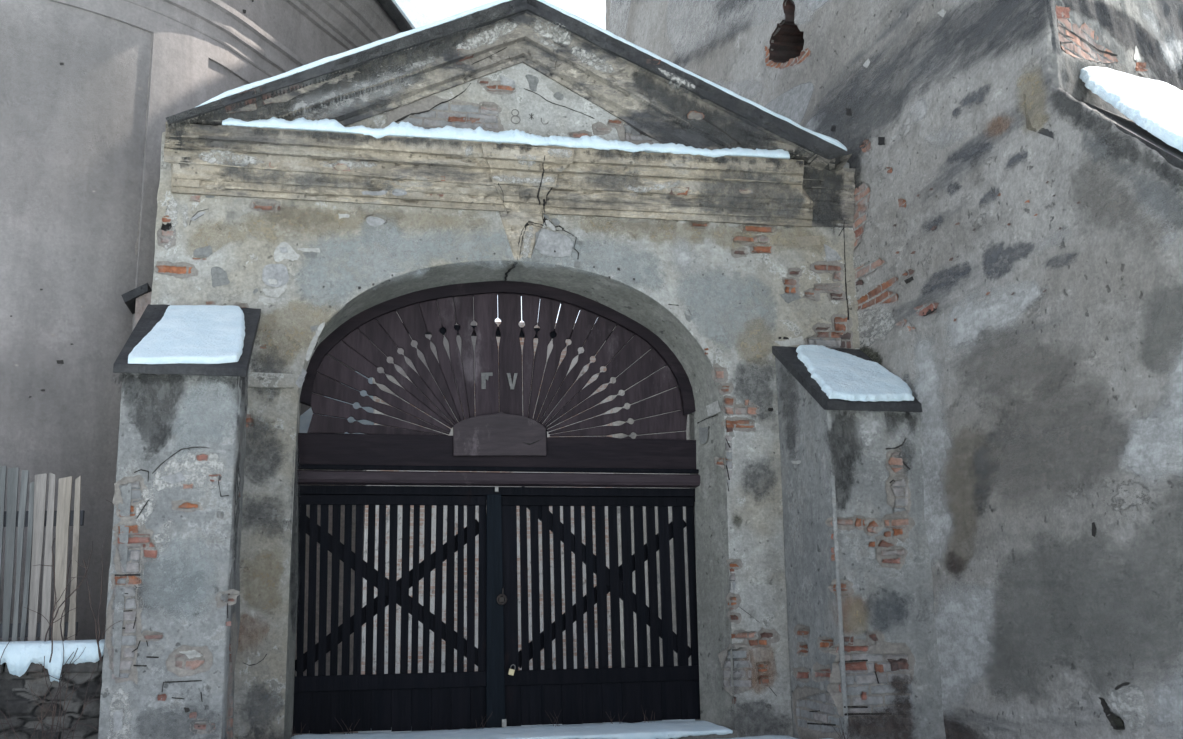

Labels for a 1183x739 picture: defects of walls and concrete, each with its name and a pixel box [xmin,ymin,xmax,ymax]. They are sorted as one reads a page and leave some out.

flaking render [1055,5,1118,63]
leakage [261,129,472,156]
leakage [492,144,555,184]
crack [503,156,583,282]
flaking render [774,181,939,349]
leakage [948,283,1066,391]
leakage [119,373,182,459]
leakage [821,411,862,509]
flaking render [825,447,915,570]
flaking render [106,451,247,739]
flaking render [718,558,780,704]
flaking render [792,624,915,739]